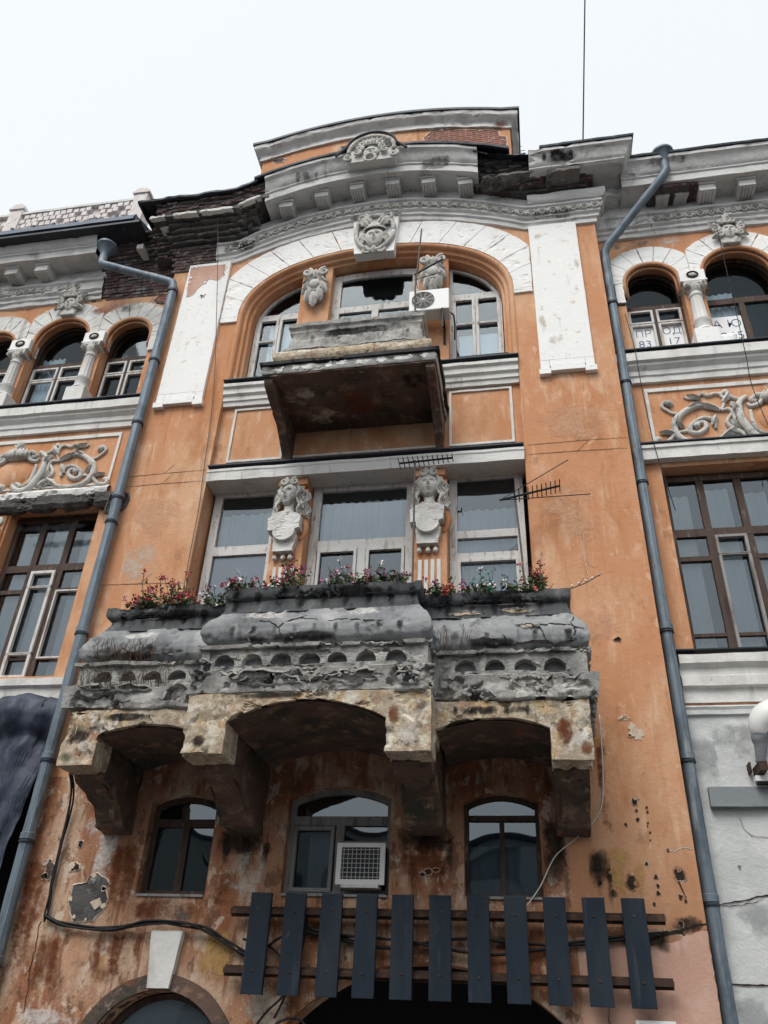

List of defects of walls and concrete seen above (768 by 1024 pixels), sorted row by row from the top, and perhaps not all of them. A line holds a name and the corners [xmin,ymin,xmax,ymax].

peeling [186,264,226,298]
spalling [80,681,152,695]
spalling [191,658,215,682]
spalling [237,668,302,688]
spalling [321,666,378,688]
spalling [394,669,424,685]
spalling [67,840,111,924]
leakage [92,829,117,879]
leakage [220,832,269,868]
leakage [405,831,452,864]
leakage [590,848,625,894]
leakage [200,933,231,976]